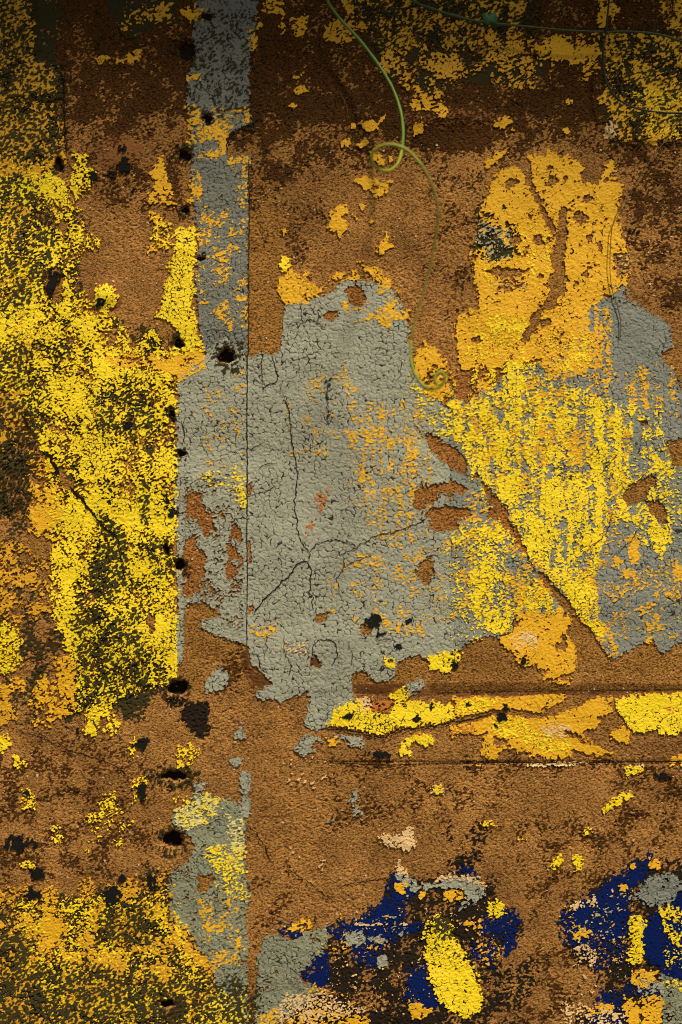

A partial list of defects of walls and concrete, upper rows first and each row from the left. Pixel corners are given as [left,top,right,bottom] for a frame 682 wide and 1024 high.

spalling [487,165,602,345]
spalling [321,310,340,321]
spalling [344,280,367,308]
crack [0,0,682,812]
spalling [665,438,682,469]
spalling [412,432,527,553]
spalling [623,474,669,524]
spalling [180,492,272,697]
spalling [415,555,435,586]
spalling [350,568,682,725]
spalling [597,712,621,734]
spalling [196,873,216,893]